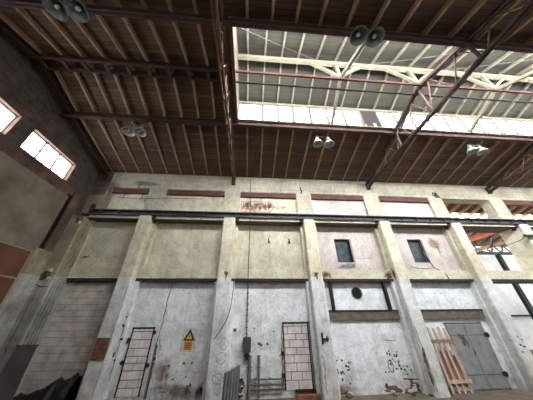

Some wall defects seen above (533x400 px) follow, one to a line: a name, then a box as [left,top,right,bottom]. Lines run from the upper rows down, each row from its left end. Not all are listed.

crack [150,283,173,394]
leakage [162,385,203,398]
spalling [384,350,422,394]